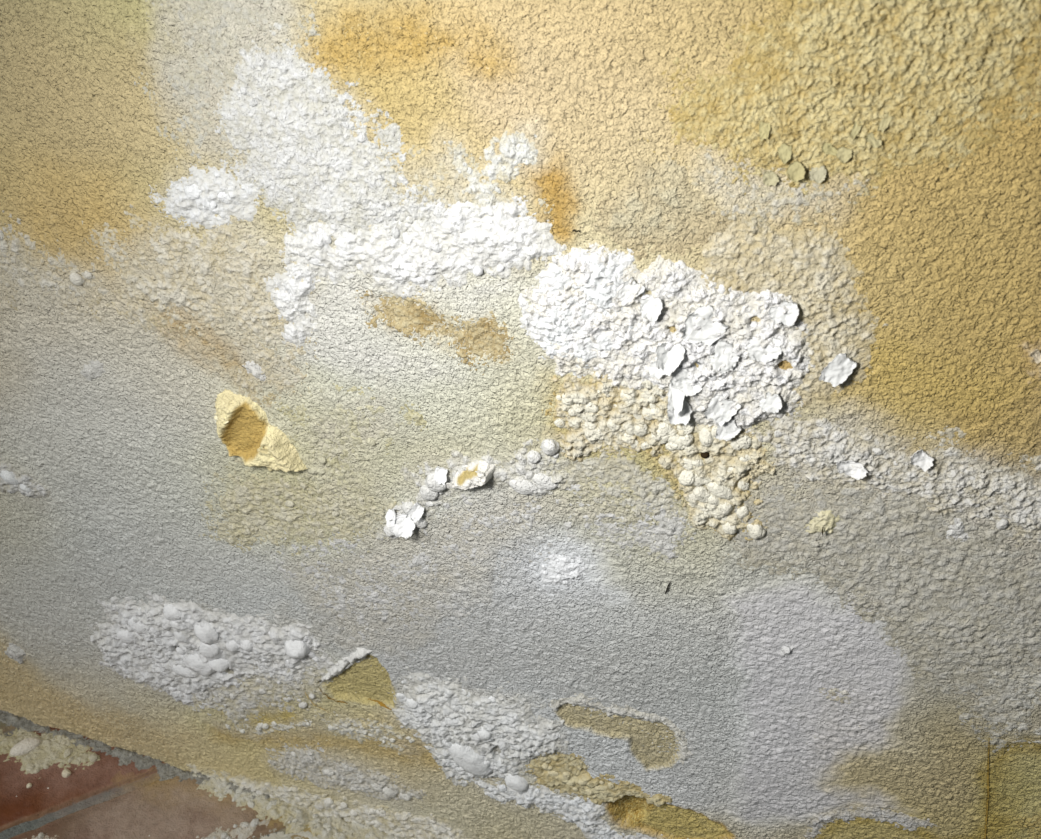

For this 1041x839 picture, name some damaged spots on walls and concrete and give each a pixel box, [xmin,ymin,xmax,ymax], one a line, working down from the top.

damp [123,0,644,440]
peeling [518,242,857,462]
peeling [1016,335,1041,391]
peeling [434,460,496,490]
peeling [385,502,424,539]
spalling [320,647,396,709]
spalling [548,693,694,773]
damp [0,745,405,839]
spalling [525,752,740,839]